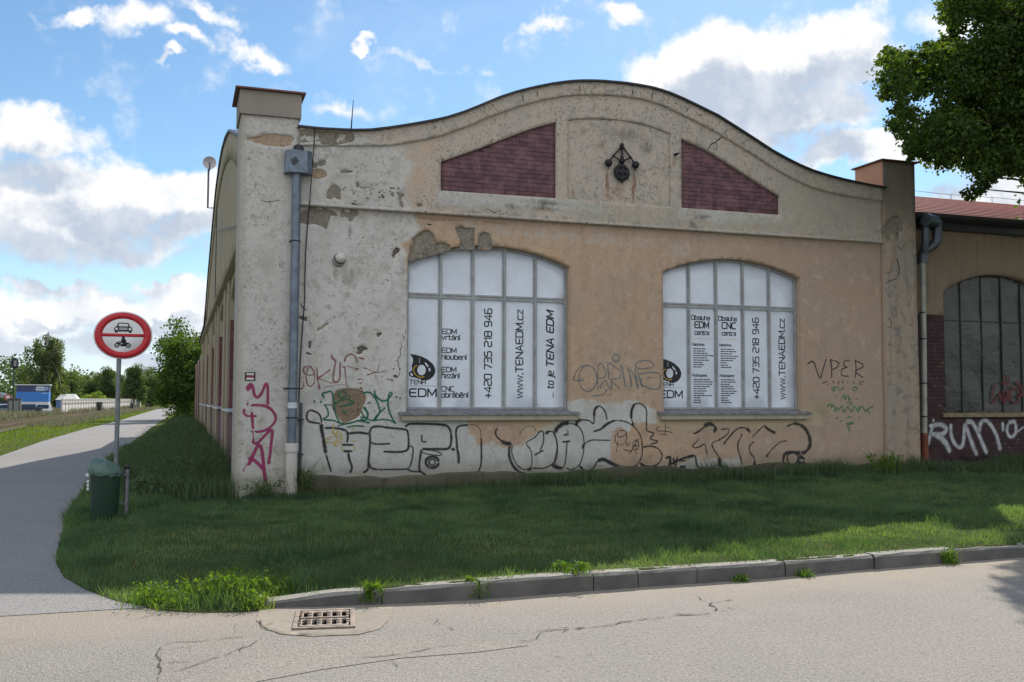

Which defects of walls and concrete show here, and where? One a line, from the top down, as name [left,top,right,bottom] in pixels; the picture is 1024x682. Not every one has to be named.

spalling [247,130,355,147]
spalling [300,160,404,229]
spalling [392,226,493,262]
crack [156,619,281,679]